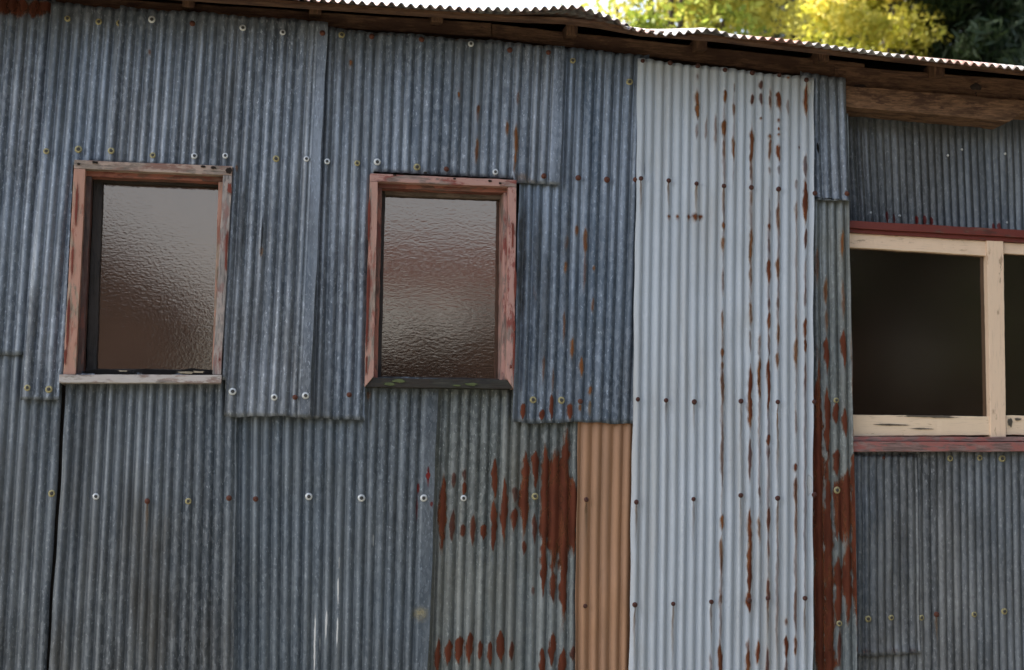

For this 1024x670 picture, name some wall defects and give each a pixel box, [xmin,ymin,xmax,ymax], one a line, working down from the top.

rust [722,90,735,157]
rust [751,81,781,161]
rust [799,146,808,248]
rust [767,259,779,282]
rust [794,319,807,363]
rust [748,312,780,478]
rust [437,387,592,623]
rust [804,330,857,670]
rust [745,504,778,612]
rust [434,631,514,670]
rust [538,633,575,670]
rust [746,641,769,670]